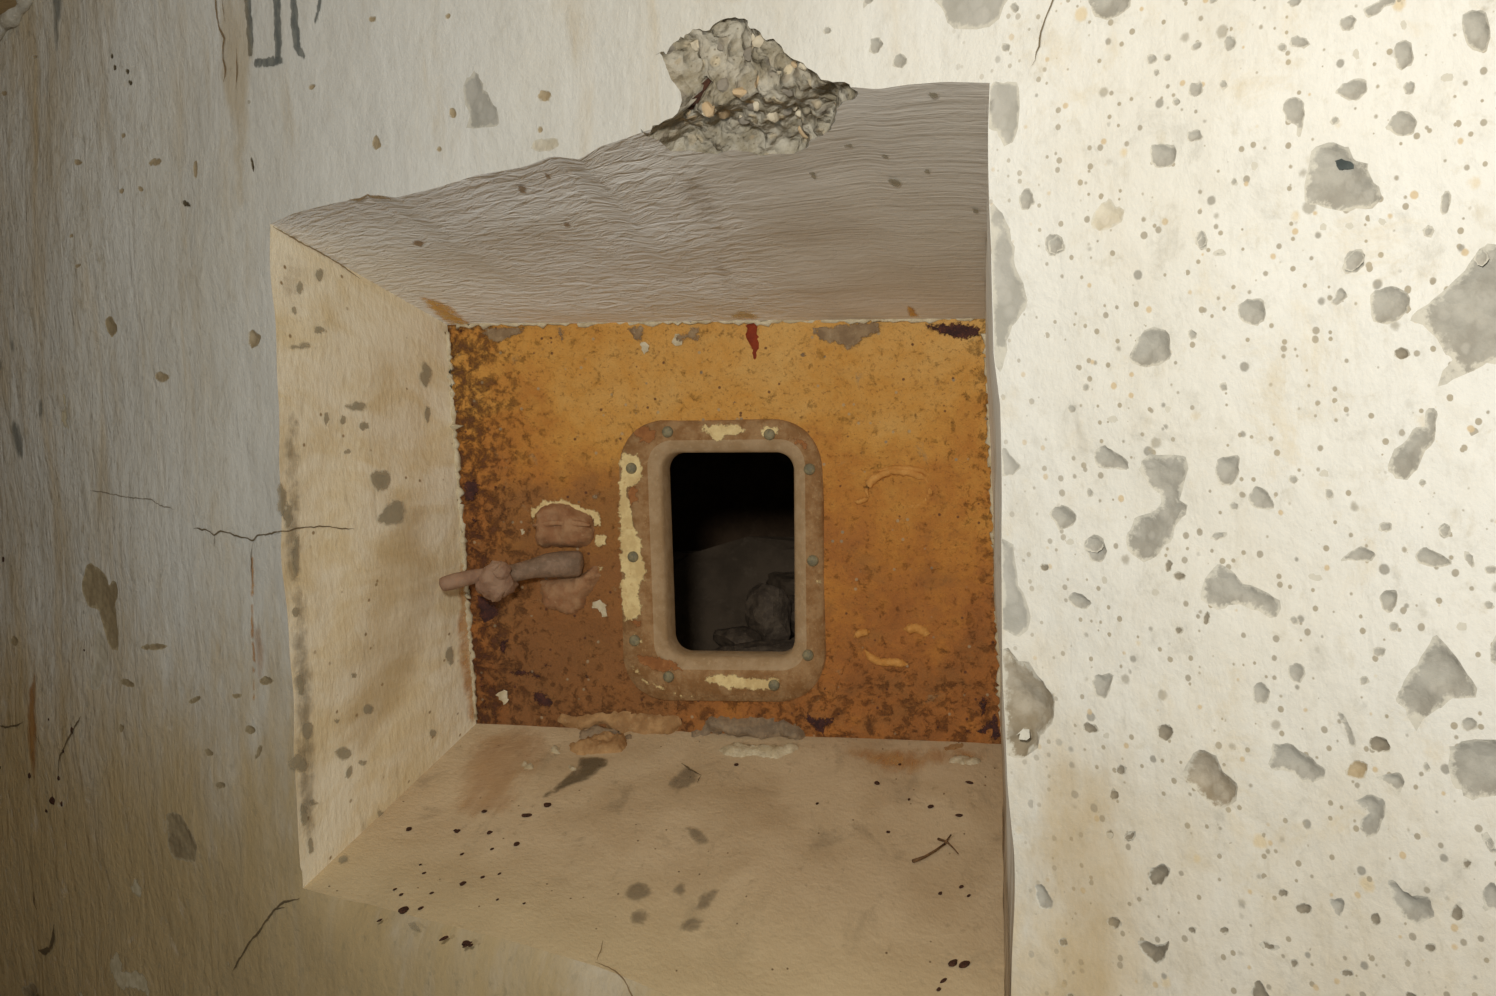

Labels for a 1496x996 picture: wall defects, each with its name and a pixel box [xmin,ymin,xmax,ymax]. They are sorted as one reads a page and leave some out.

crack [1033,0,1053,63]
spalling [641,17,858,156]
corrosion [745,323,759,360]
corrosion [463,479,480,527]
corrosion [628,485,639,507]
corrosion [477,595,498,623]
corrosion [510,663,553,707]
corrosion [637,655,683,672]
corrosion [800,713,834,736]
corrosion [966,696,1001,740]
crack [233,898,299,970]